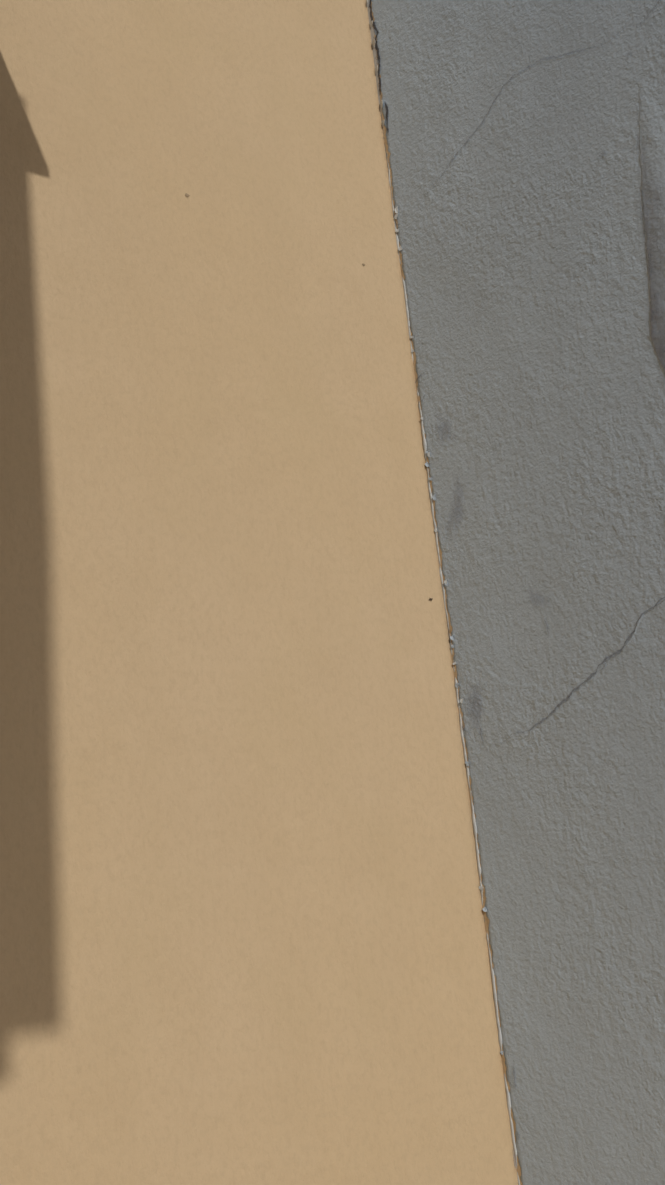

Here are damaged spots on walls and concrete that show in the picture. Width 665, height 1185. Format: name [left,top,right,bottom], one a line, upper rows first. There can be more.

crack [534,599,665,726]